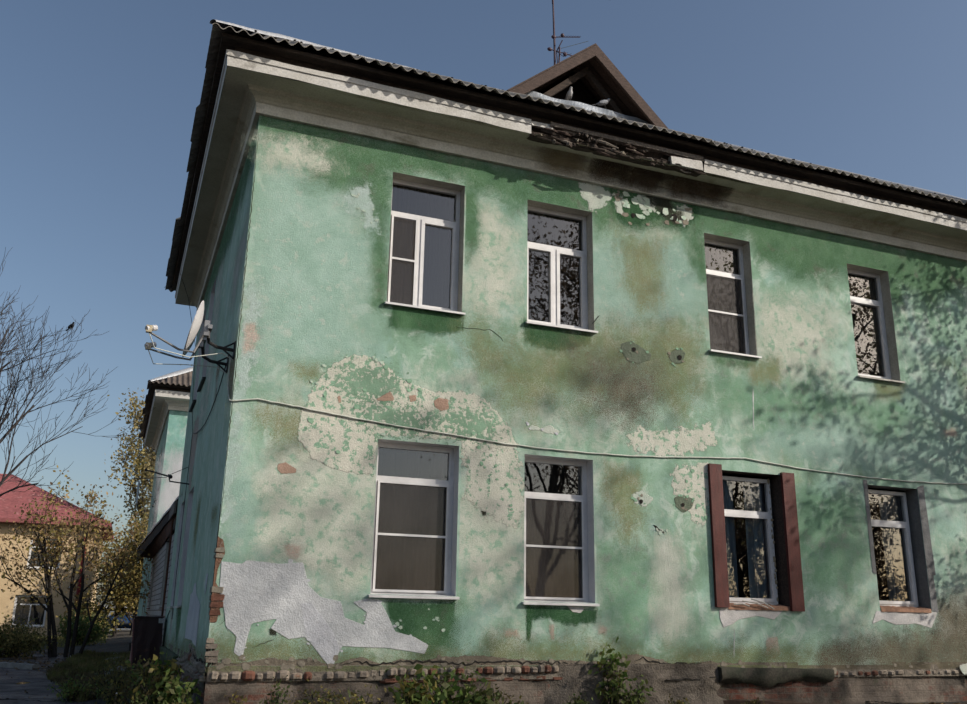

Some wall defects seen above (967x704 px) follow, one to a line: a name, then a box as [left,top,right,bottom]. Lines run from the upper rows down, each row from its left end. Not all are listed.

spalling [578,182,700,232]
spalling [620,341,651,363]
spalling [668,347,685,366]
peeling [209,278,270,629]
peeling [297,353,525,531]
peeling [626,421,717,527]
spalling [178,643,787,677]
damp [165,587,967,683]